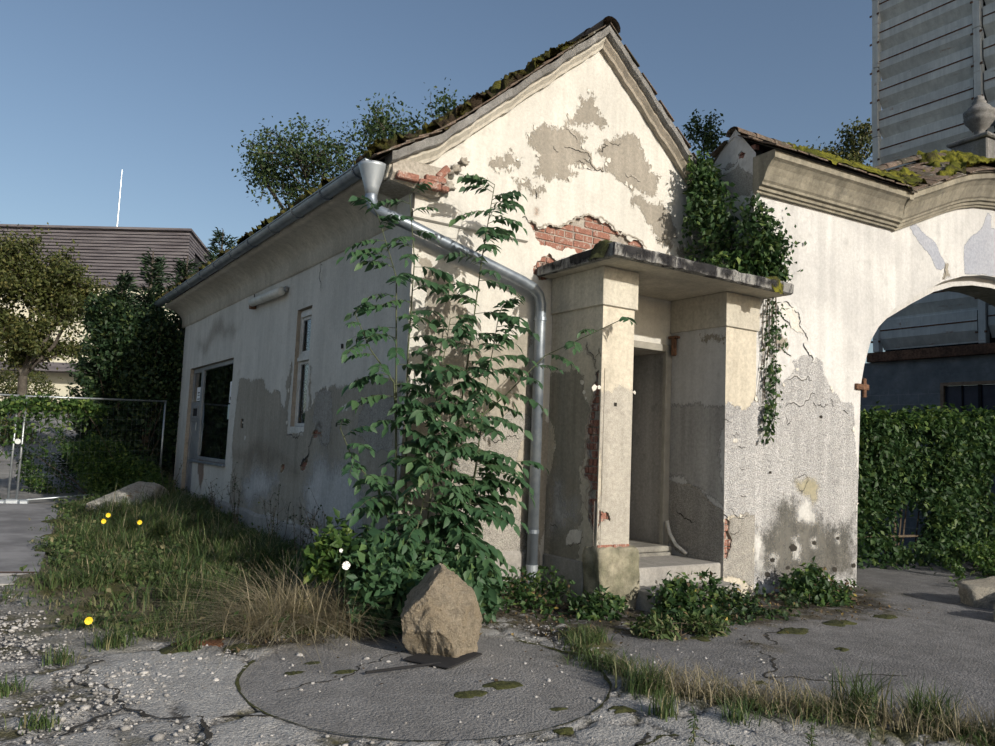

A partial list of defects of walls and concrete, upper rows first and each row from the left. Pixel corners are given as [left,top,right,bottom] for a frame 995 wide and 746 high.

spalling [395,157,470,194]
peeling [488,89,696,280]
peeling [229,252,636,560]
flaking render [668,298,859,588]
leakage [754,479,853,585]